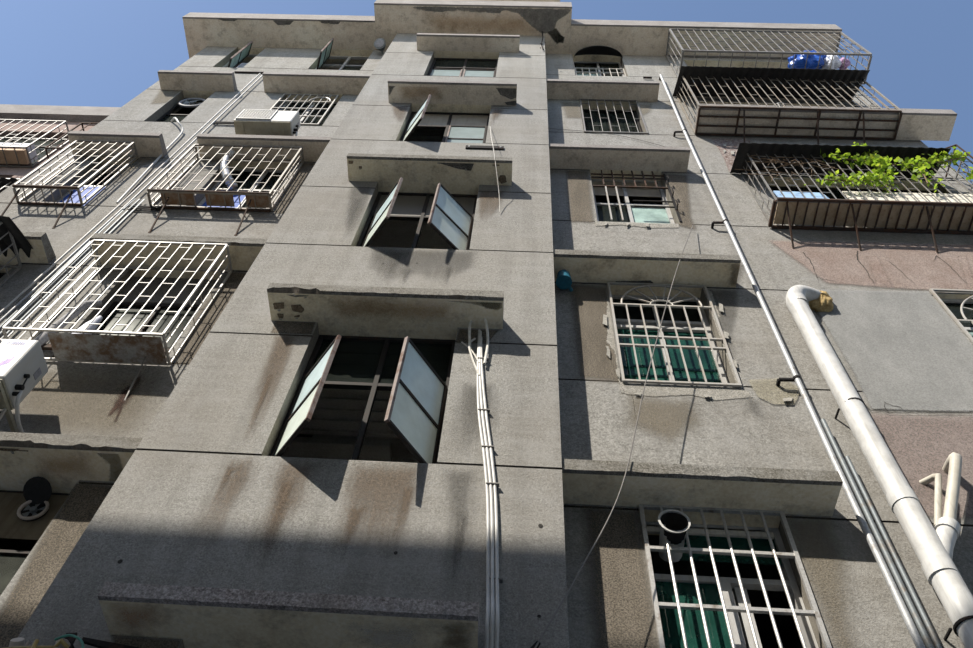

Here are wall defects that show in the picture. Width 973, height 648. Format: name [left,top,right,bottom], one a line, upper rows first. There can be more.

peeling [413,6,570,33]
peeling [273,294,309,320]
rust [109,377,140,422]